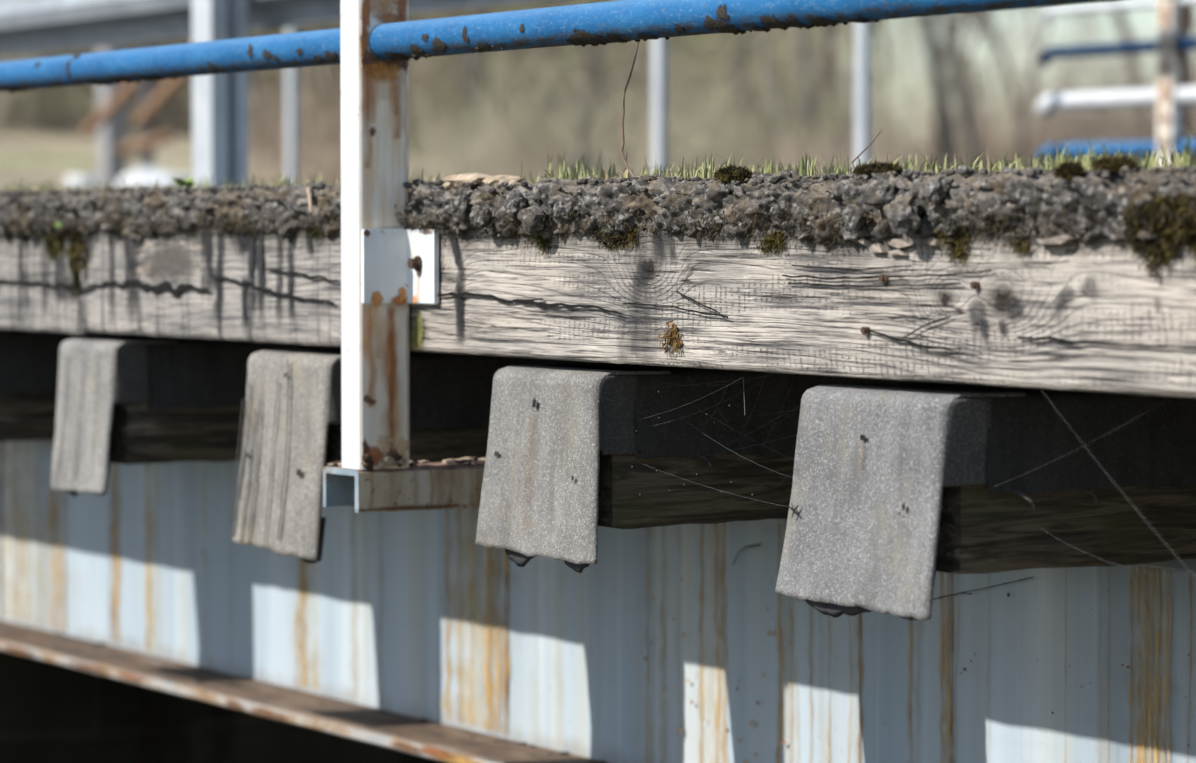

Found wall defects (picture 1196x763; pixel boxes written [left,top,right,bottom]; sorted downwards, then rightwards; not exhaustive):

rust [360,0,409,137]
water stain [18,235,46,304]
water stain [85,228,137,309]
crack [0,269,340,331]
water stain [201,226,311,325]
crack [438,291,728,318]
rust [362,271,419,466]
rust [464,547,509,726]
rust [393,741,476,763]